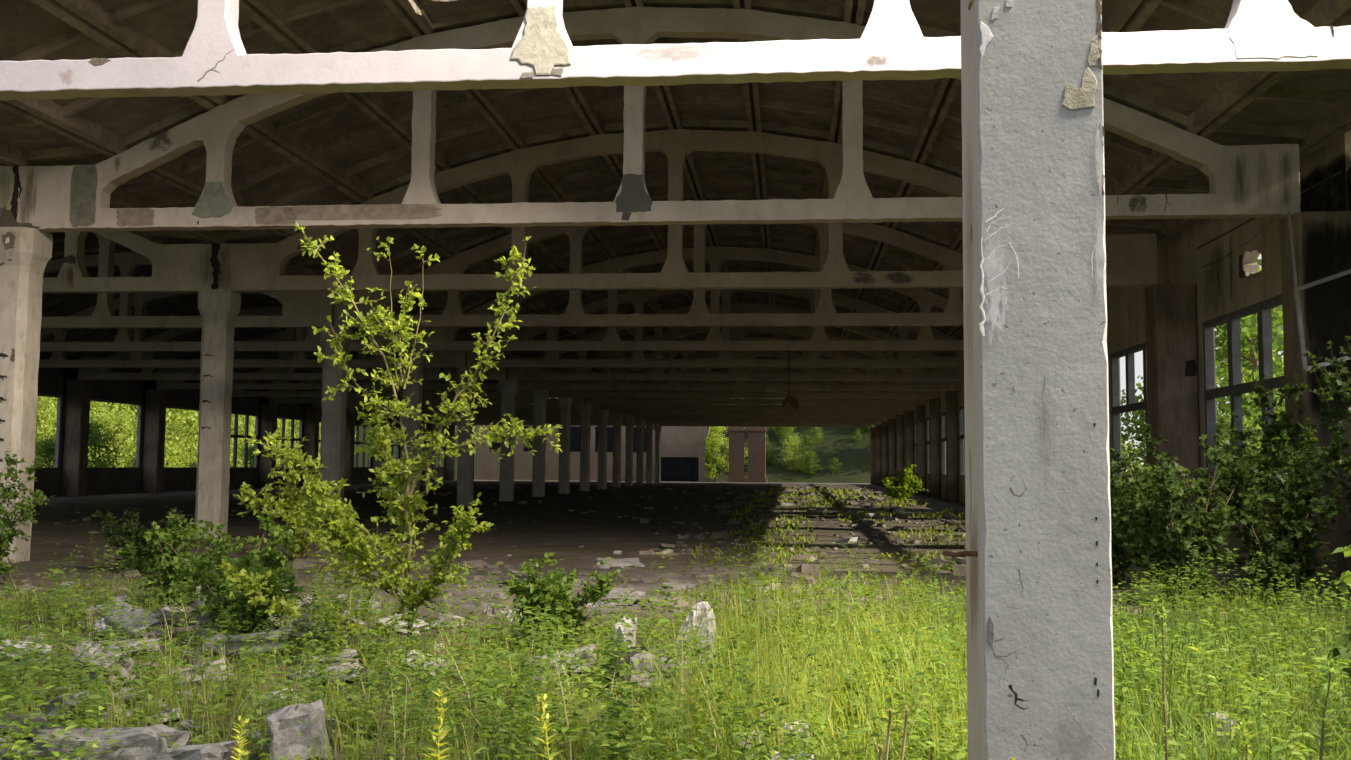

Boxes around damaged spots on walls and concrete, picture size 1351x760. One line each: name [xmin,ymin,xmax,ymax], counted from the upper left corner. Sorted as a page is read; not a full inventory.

spalling [510,5,571,79]
peeling [968,0,1013,59]
spalling [1228,0,1318,59]
crack [10,166,22,221]
spalling [615,174,652,221]
crack [987,627,1032,752]